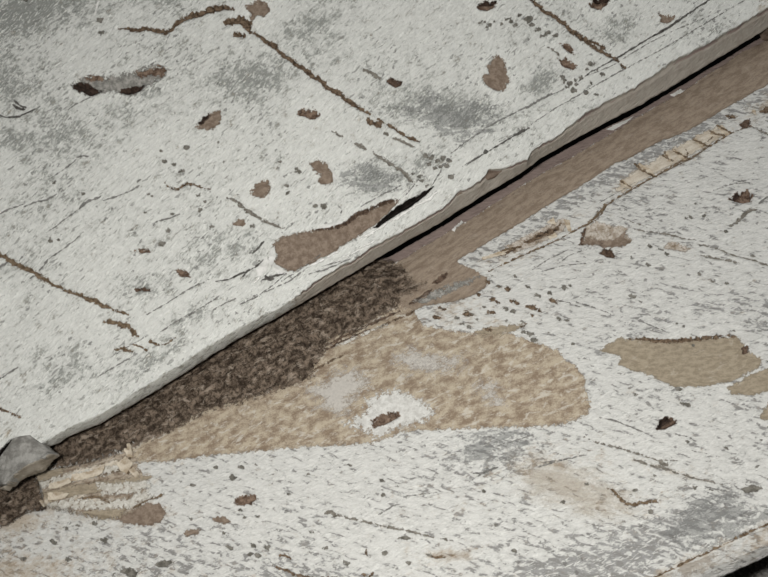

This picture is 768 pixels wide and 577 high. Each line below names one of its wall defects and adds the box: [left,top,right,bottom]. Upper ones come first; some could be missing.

spalling [245,0,270,22]
spalling [477,0,605,96]
crack [530,0,627,69]
spalling [70,64,170,97]
crack [119,4,420,148]
crack [332,131,417,186]
crack [50,179,141,230]
crack [164,182,284,229]
peeling [116,41,768,479]
crack [0,231,176,353]
peeling [39,465,105,507]
peeling [115,502,166,526]